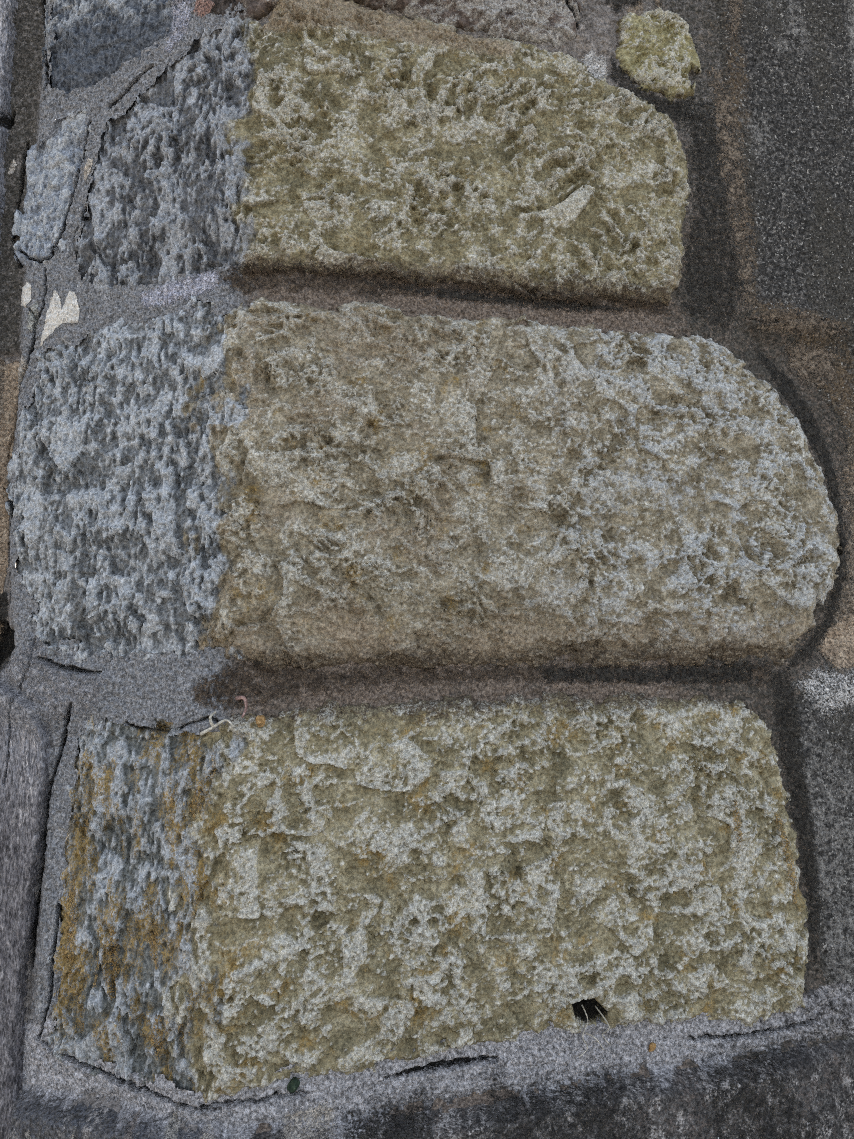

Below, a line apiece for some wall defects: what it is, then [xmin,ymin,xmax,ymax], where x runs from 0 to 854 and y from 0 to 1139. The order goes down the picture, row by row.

crack [565,0,580,29]
crack [13,124,90,378]
crack [28,711,277,1110]
crack [689,1022,805,1041]
crack [383,1055,489,1079]